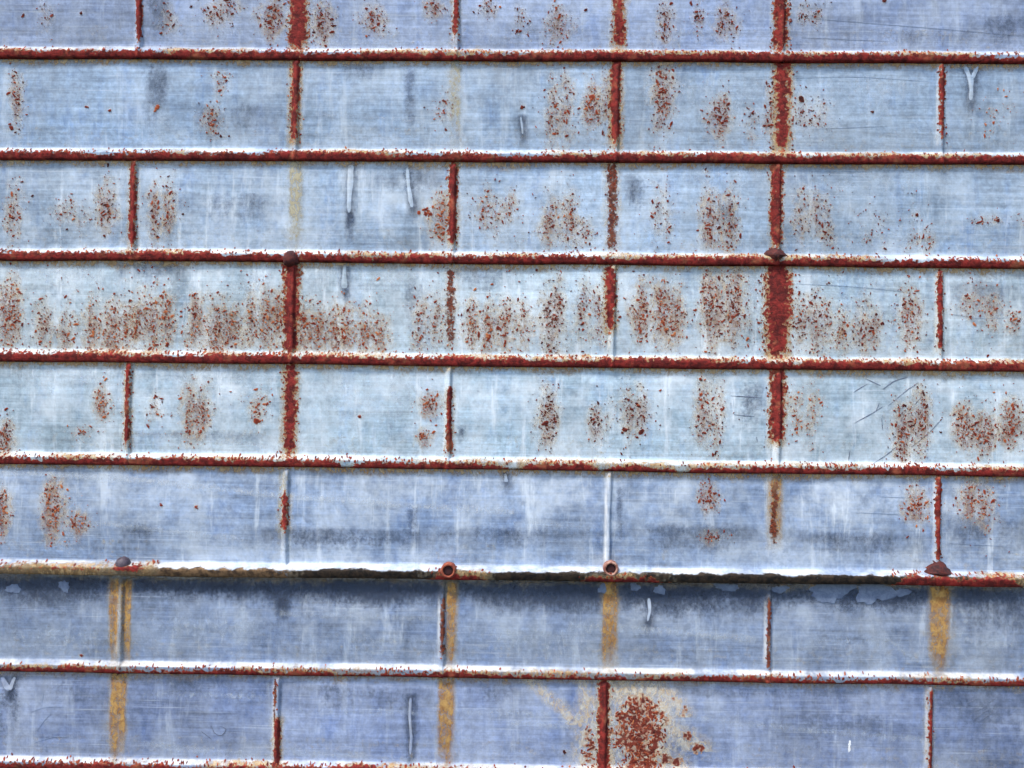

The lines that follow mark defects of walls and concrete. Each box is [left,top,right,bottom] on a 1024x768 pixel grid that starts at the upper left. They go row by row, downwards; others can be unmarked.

rust [0,0,1024,563]
rust [0,559,1024,768]